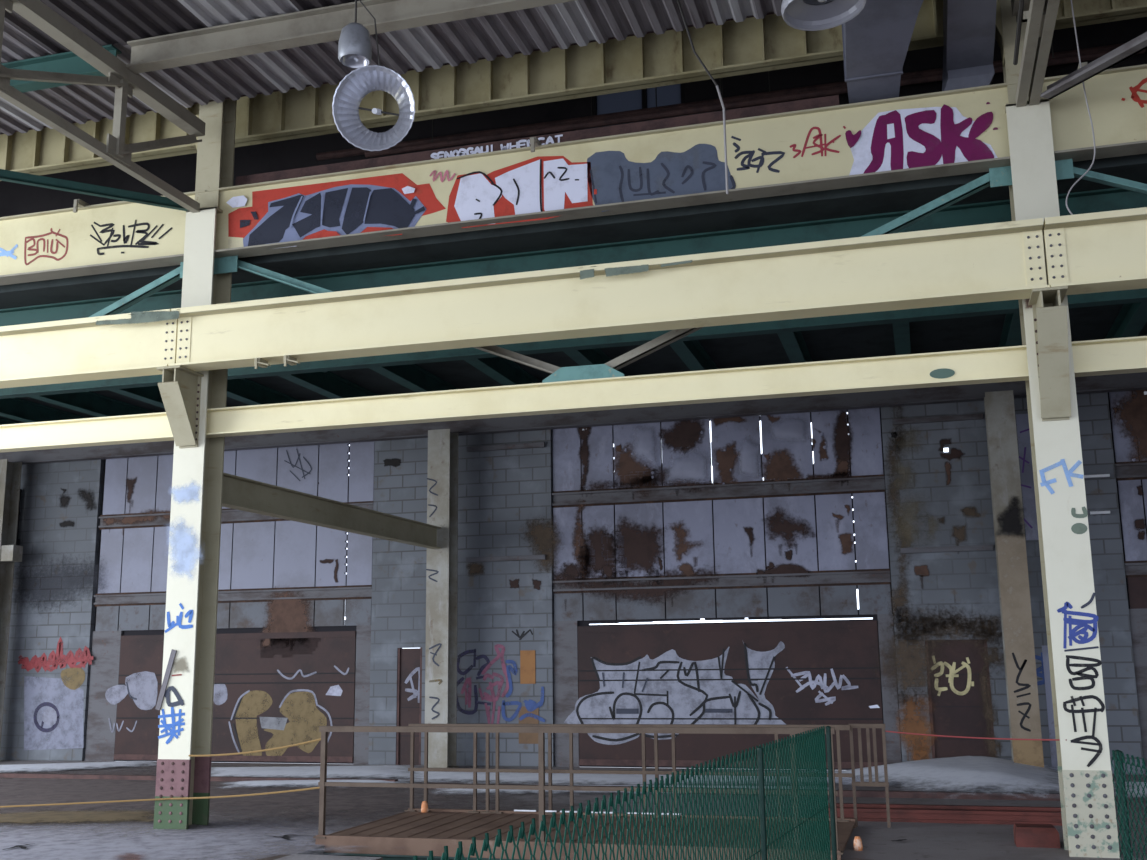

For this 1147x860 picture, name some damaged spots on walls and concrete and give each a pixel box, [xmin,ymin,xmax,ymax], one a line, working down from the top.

corrosion [763,411,852,482]
corrosion [552,427,717,603]
corrosion [744,508,814,577]
corrosion [838,533,854,555]
corrosion [262,588,312,647]
corrosion [881,406,1003,761]